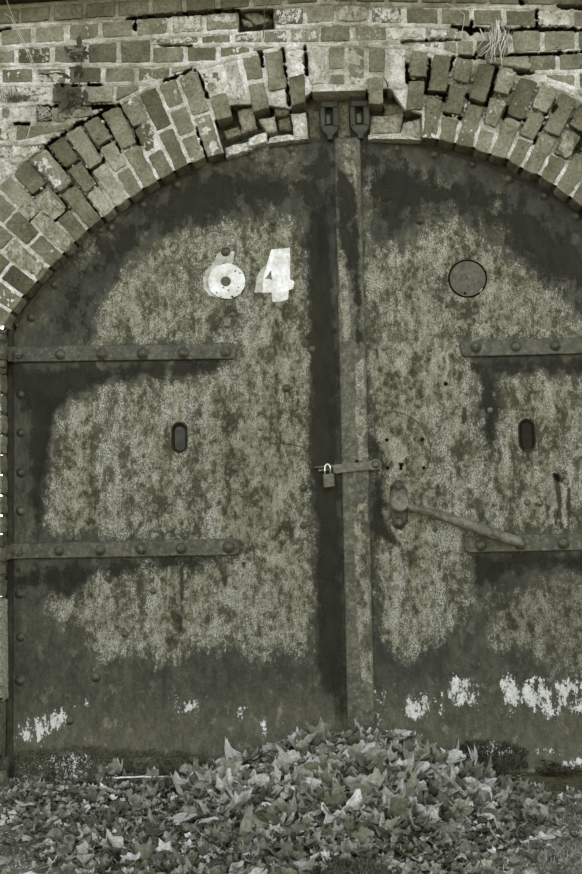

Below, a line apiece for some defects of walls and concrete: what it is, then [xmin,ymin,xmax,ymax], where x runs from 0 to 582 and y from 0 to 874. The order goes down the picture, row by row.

spalling [241,12,274,31]
rust [553,472,572,529]
peeling [405,675,479,721]
peeling [500,672,582,720]
peeling [16,698,88,747]